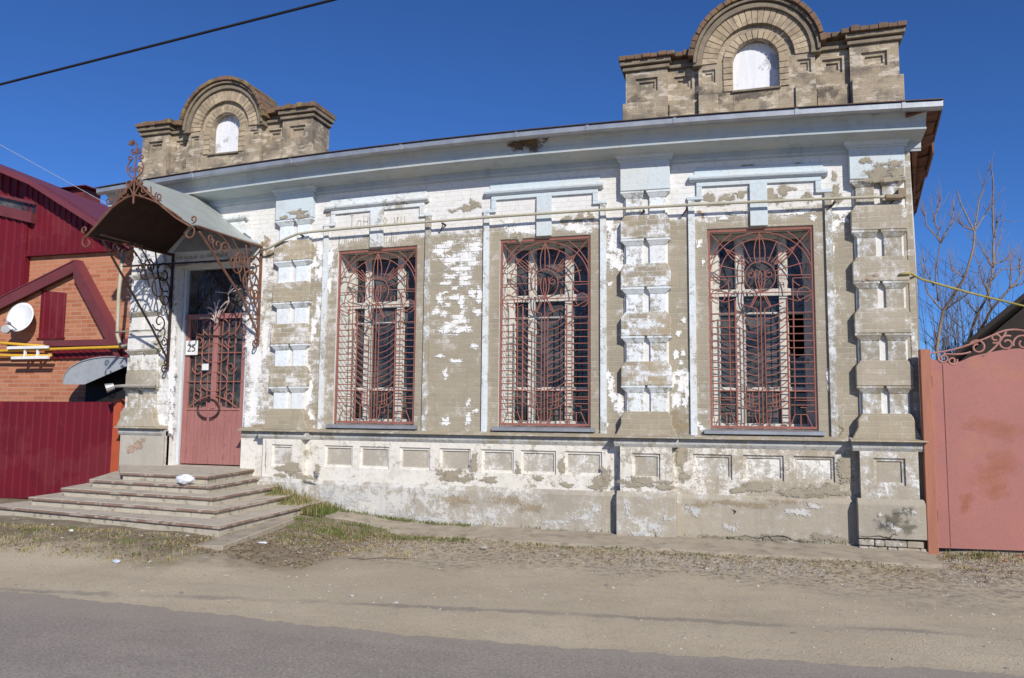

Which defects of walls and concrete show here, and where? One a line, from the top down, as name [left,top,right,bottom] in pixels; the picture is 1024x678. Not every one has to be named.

peeling [859,157,908,183]
peeling [280,208,309,219]
peeling [448,197,482,213]
peeling [699,191,748,222]
peeling [767,184,817,222]
peeling [431,237,483,350]
peeling [274,463,321,481]
peeling [558,458,574,488]
peeling [729,451,854,499]